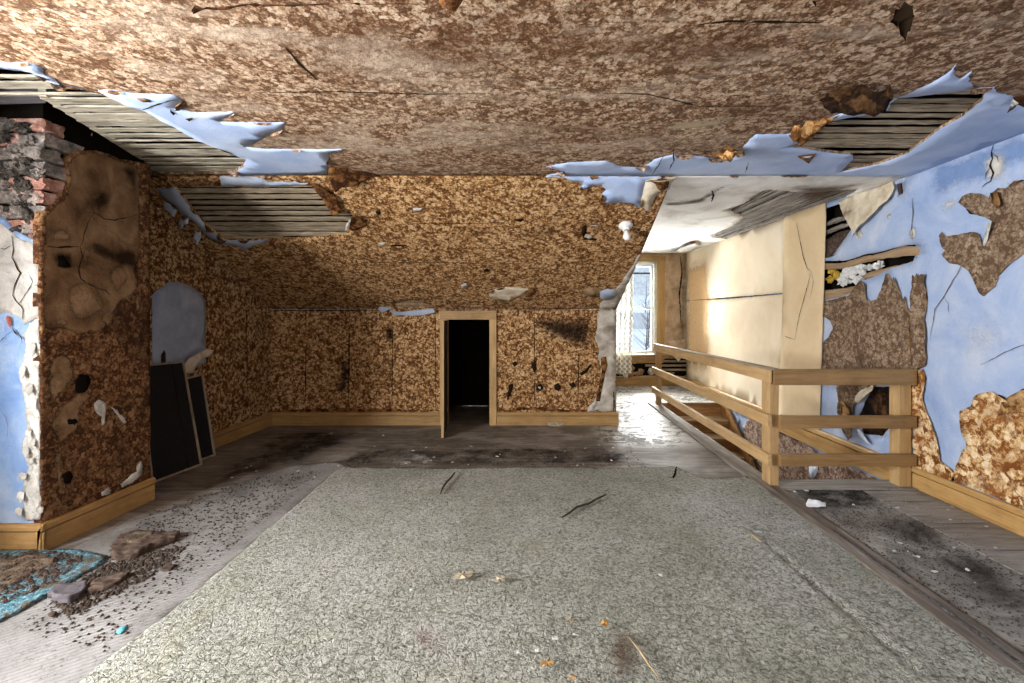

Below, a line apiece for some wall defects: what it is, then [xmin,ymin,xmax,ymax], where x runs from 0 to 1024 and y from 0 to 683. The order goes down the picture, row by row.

peeling [546,65,1024,211]
leakage [94,244,136,269]
flaking render [0,62,352,521]
peeling [582,255,687,412]
crack [785,223,813,339]
spalling [722,190,919,300]
hole [860,387,889,415]
hole [862,428,889,436]